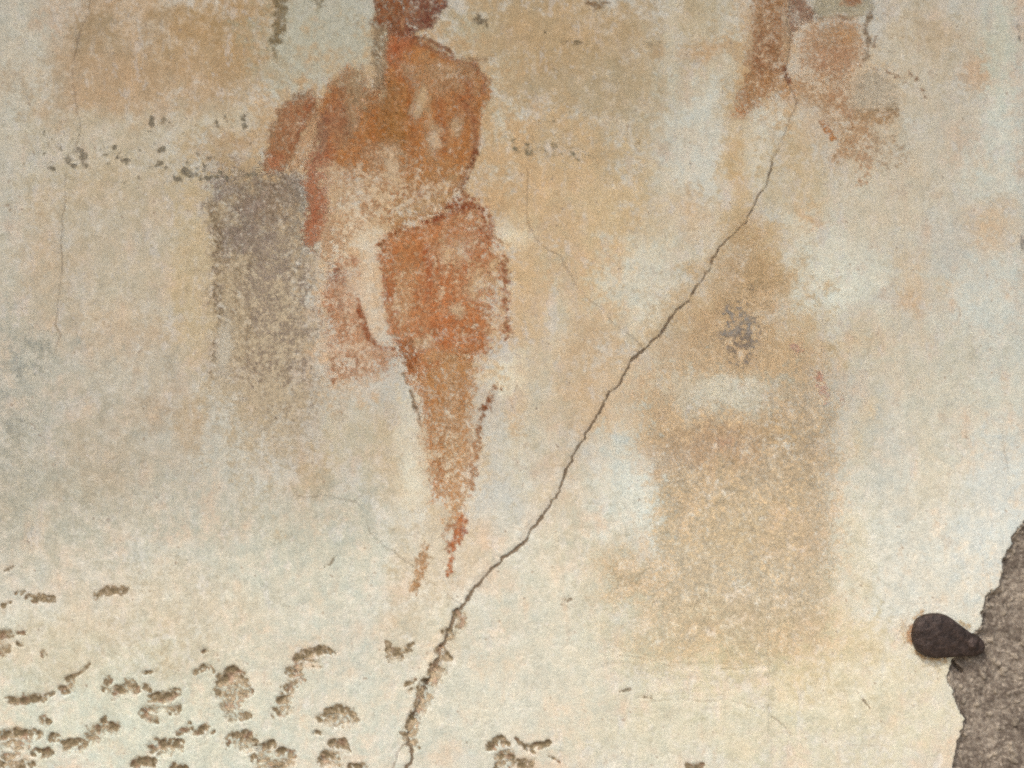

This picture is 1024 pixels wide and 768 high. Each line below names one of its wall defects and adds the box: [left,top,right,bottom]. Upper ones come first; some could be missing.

crack [399,286,696,768]
spalling [1,590,56,609]
spalling [93,585,129,599]
spalling [0,629,26,657]
spalling [0,663,120,768]
spalling [101,649,297,768]
spalling [271,645,336,718]
spalling [315,704,365,768]
spalling [384,640,415,663]
spalling [486,735,560,768]
flaking render [947,522,1024,768]